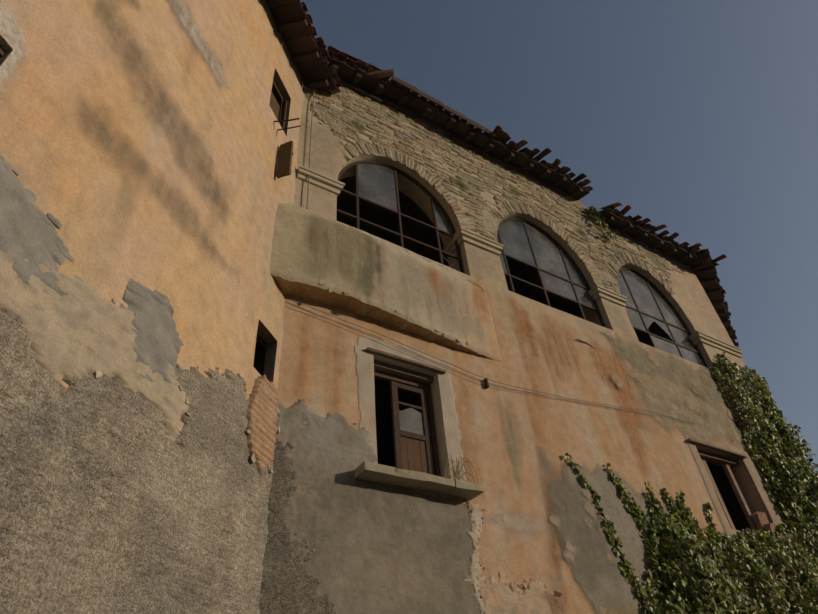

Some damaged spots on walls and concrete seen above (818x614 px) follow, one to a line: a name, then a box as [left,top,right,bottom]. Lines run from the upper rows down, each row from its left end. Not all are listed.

flaking render [303,80,687,295]
spalling [0,155,564,614]
spalling [549,463,734,614]